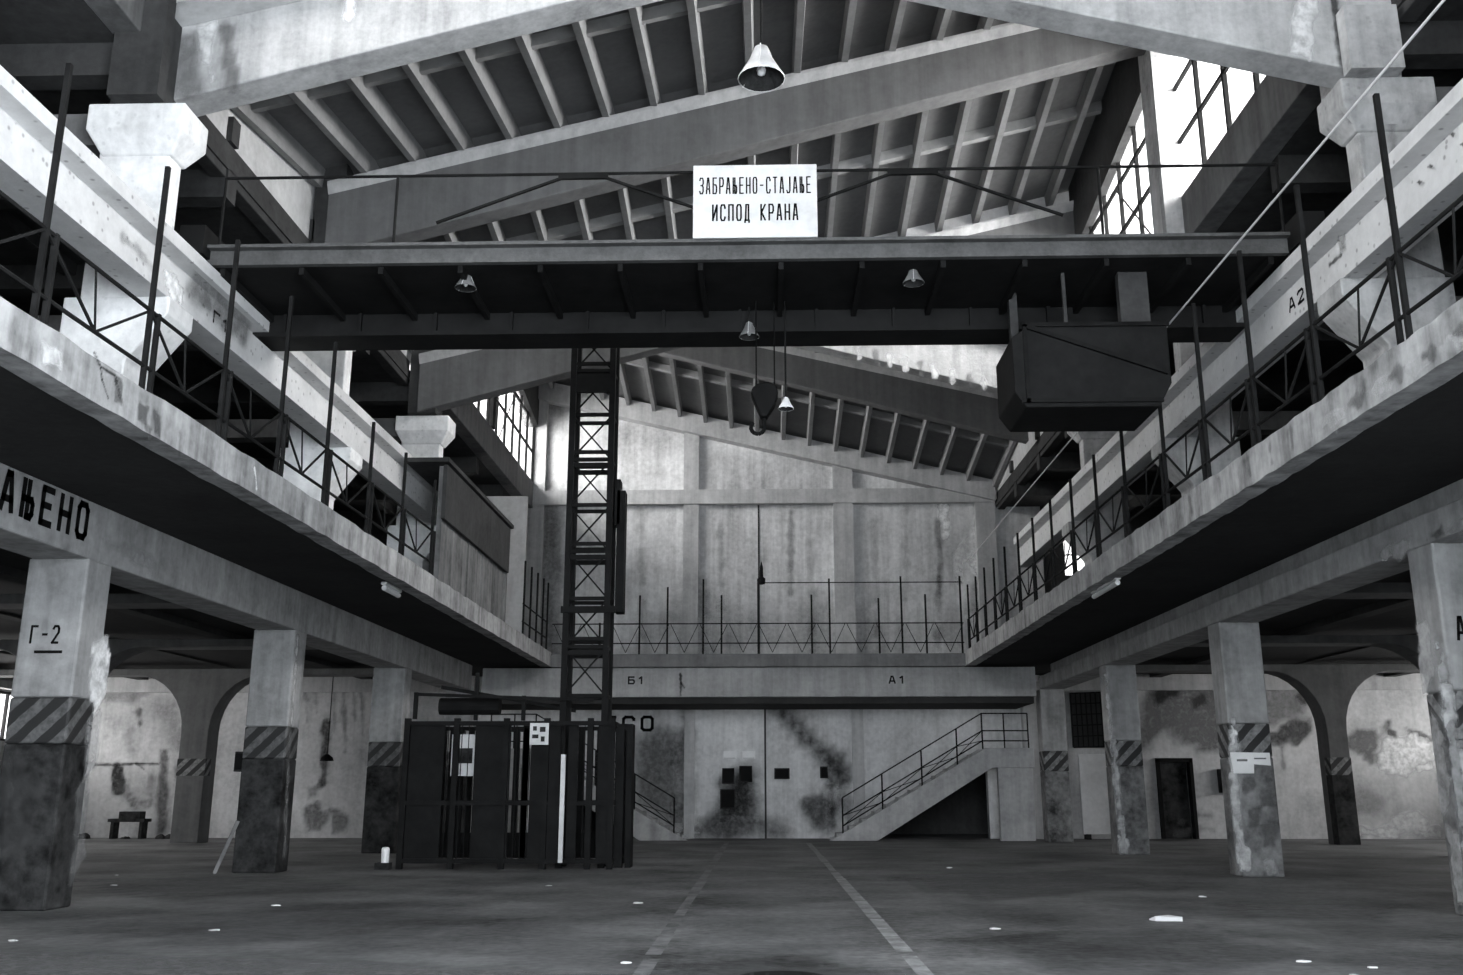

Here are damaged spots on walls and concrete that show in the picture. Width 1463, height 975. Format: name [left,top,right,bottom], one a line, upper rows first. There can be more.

peeling [305,719,347,832]
peeling [1141,690,1276,873]
peeling [1266,690,1311,745]
peeling [1348,623,1463,902]